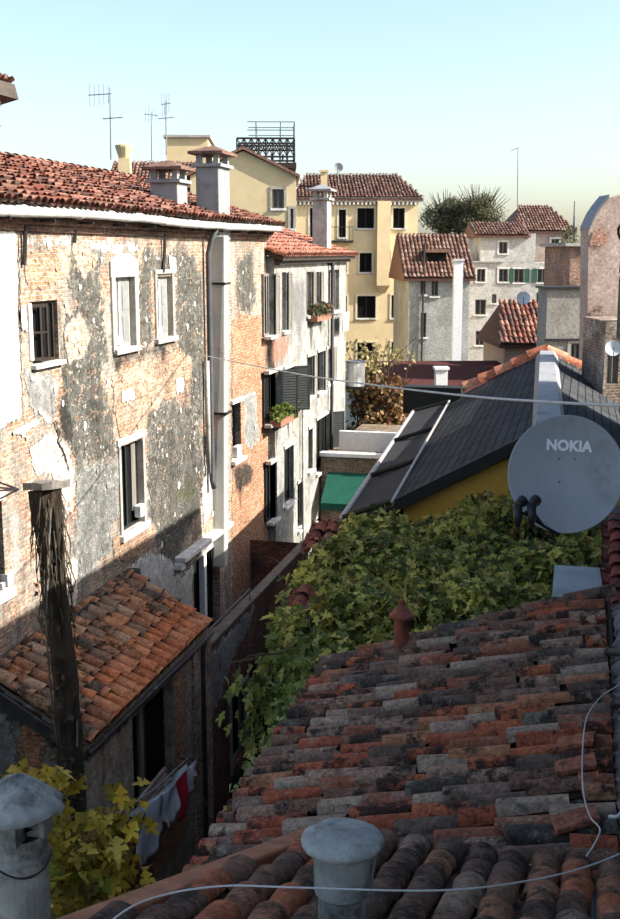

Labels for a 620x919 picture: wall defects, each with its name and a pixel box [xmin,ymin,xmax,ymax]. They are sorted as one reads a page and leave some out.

peeling [22,234,214,607]
flaking render [211,250,269,718]